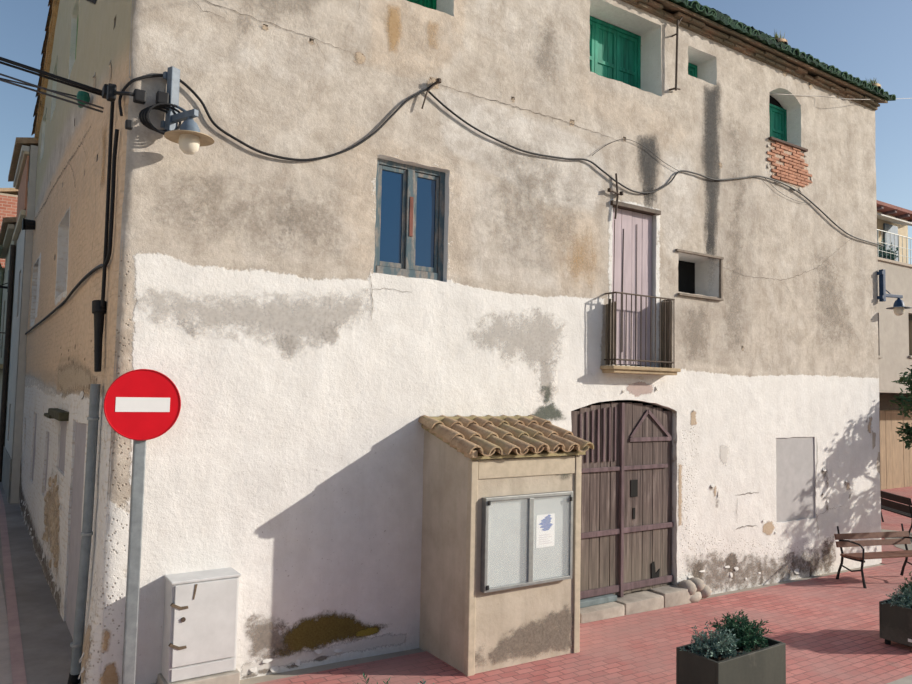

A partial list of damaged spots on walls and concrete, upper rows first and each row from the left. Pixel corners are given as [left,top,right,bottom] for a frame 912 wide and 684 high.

crack [196,0,354,61]
spalling [767,142,813,193]
peeling [473,309,565,399]
flaking render [622,376,659,397]
flaking render [21,468,61,613]
leakage [823,540,836,566]
mould [247,618,289,658]
flaking render [101,663,118,684]